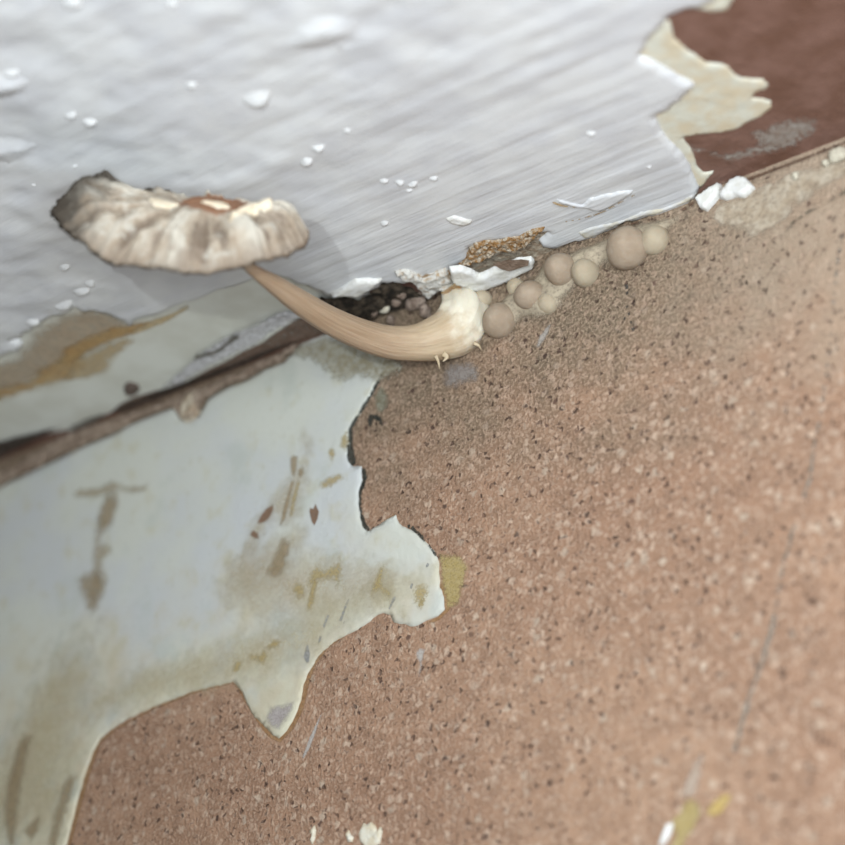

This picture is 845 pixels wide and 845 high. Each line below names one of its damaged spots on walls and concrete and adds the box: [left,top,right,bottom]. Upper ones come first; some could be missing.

peeling [578,0,845,238]
peeling [552,190,634,222]
spalling [282,256,535,321]
leakage [0,311,125,387]
leakage [78,484,116,530]
leakage [82,546,105,608]
peeling [0,279,449,845]
crack [733,527,795,752]